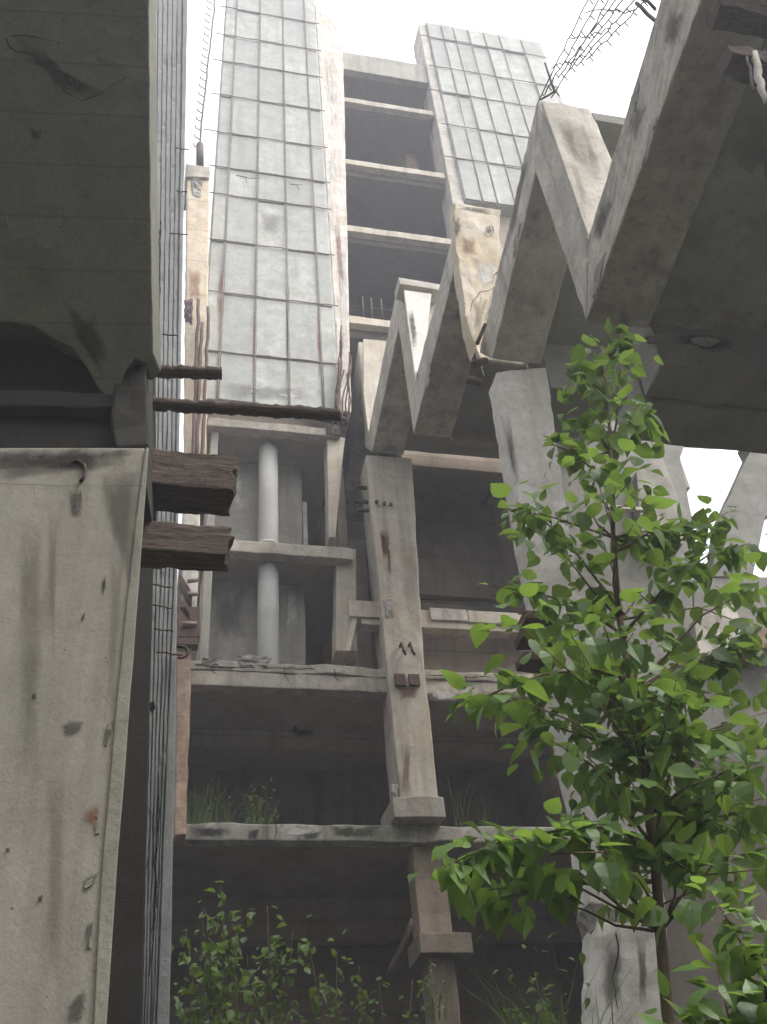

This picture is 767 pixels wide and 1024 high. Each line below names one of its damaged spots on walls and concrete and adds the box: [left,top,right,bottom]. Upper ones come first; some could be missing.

leakage [110,488,130,547]
corrosion [380,532,391,570]
leakage [197,828,224,836]
leakage [608,953,618,997]